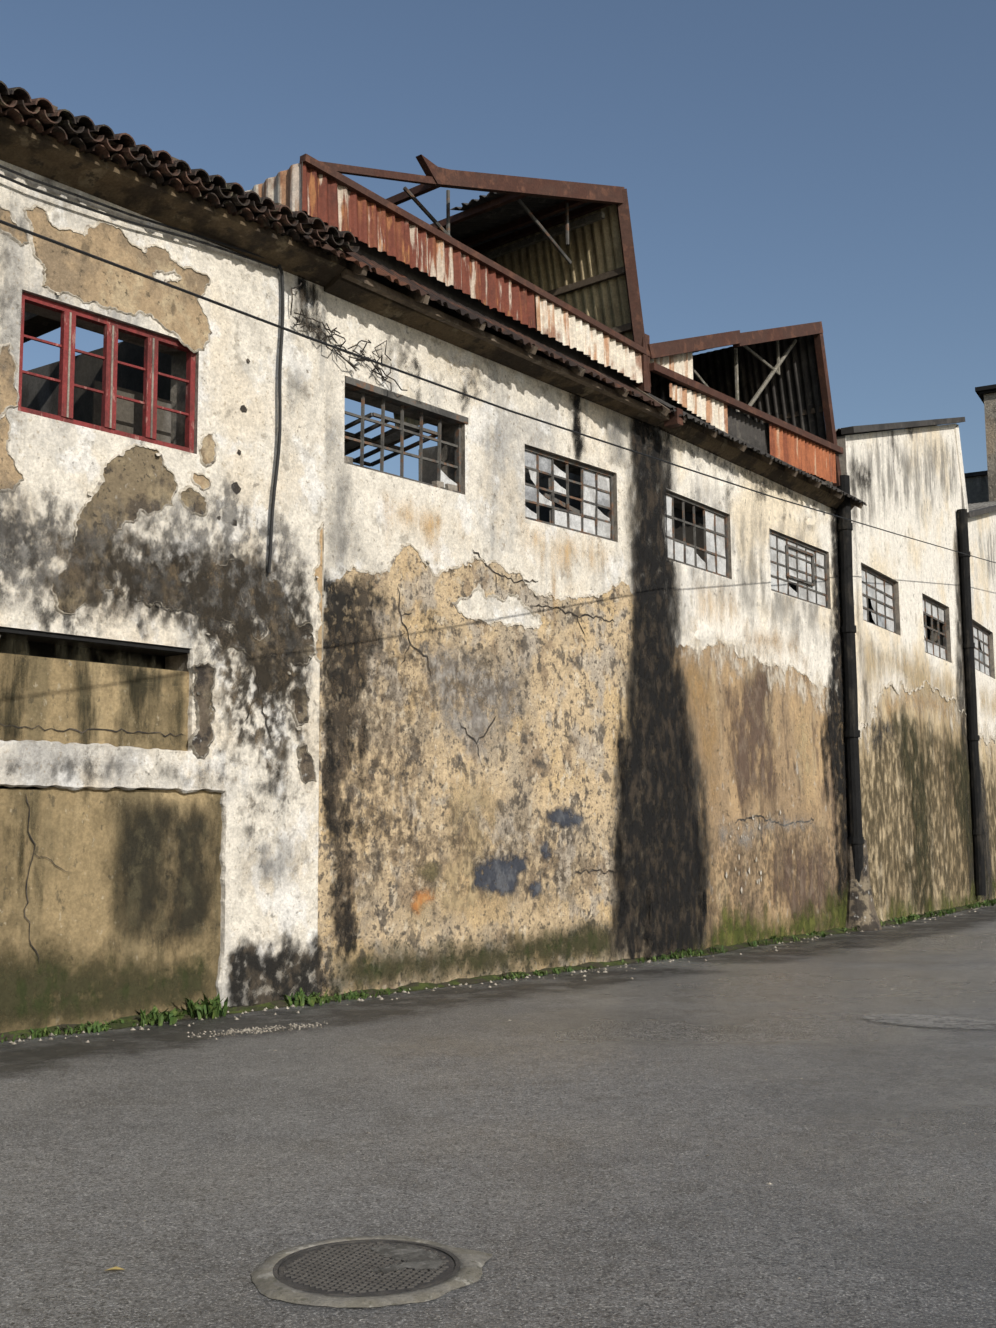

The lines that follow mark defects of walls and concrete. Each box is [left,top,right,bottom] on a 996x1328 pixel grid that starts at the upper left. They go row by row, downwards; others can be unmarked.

peeling [0,204,212,353]
peeling [0,342,24,493]
water stain [827,428,955,516]
peeling [0,649,216,760]
water stain [0,482,387,1008]
peeling [49,432,996,996]
water stain [610,417,849,960]
water stain [860,532,994,903]
spalling [0,781,228,1007]